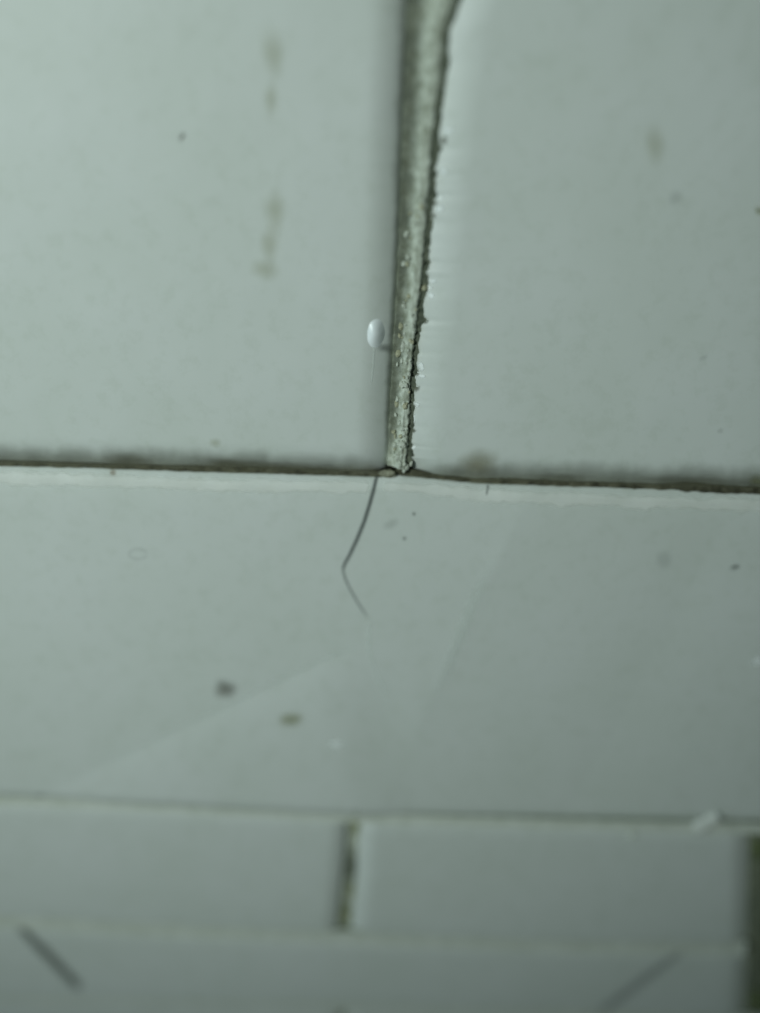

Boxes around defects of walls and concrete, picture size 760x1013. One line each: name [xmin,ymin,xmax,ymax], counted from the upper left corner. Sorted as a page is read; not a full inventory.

crack [342,476,377,569]